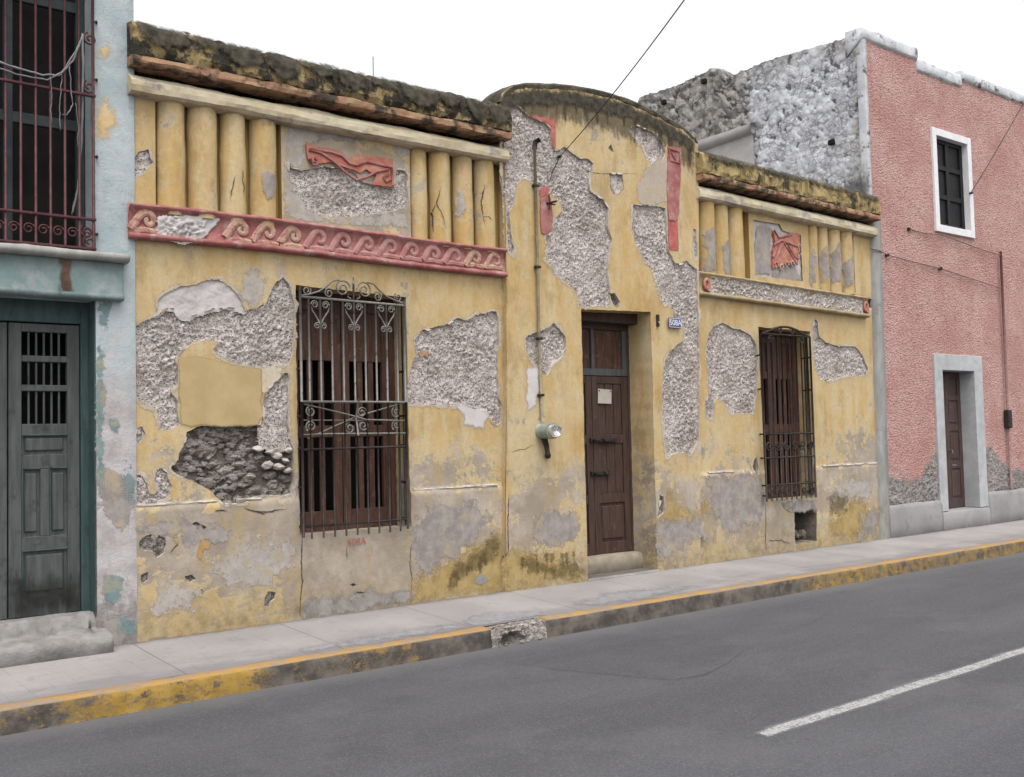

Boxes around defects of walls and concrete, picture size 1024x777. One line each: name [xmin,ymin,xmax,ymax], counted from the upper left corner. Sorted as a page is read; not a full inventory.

spalling [262,127,410,229]
crack [430,189,447,228]
spalling [498,105,624,310]
spalling [628,125,869,460]
spalling [406,309,503,428]
spalling [524,322,567,410]
spalling [95,266,299,607]
spalling [889,452,940,505]
spalling [986,447,1018,492]
leakage [303,533,583,619]
spalling [478,616,547,648]